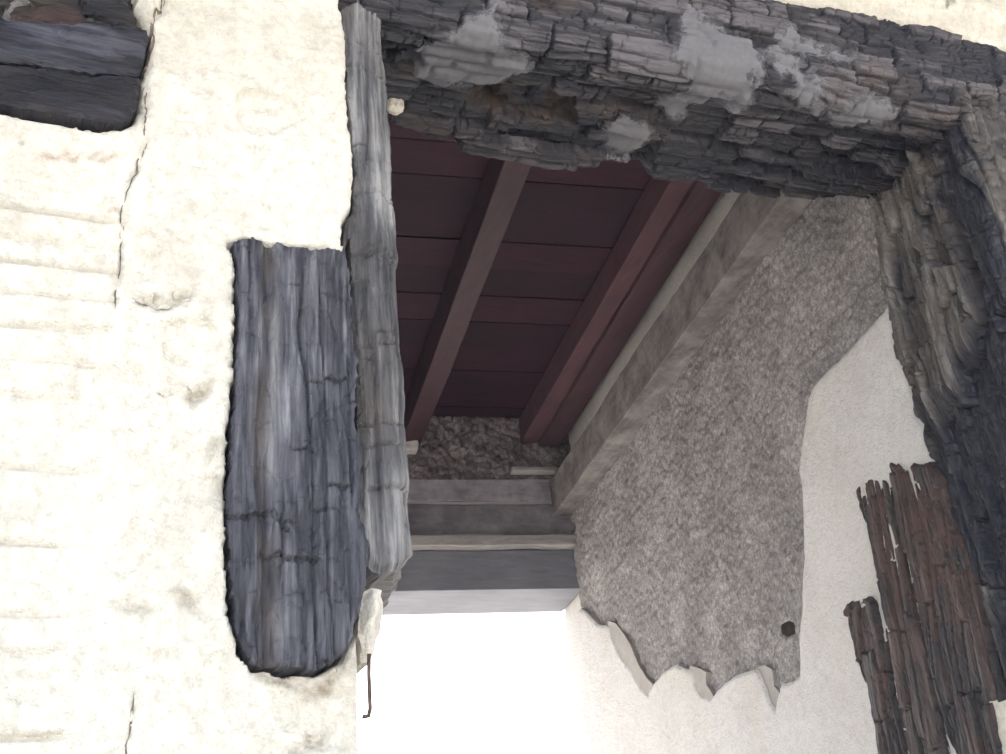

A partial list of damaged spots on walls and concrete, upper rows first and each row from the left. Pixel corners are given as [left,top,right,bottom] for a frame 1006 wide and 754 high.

crack [114,0,165,307]
crack [125,694,134,754]